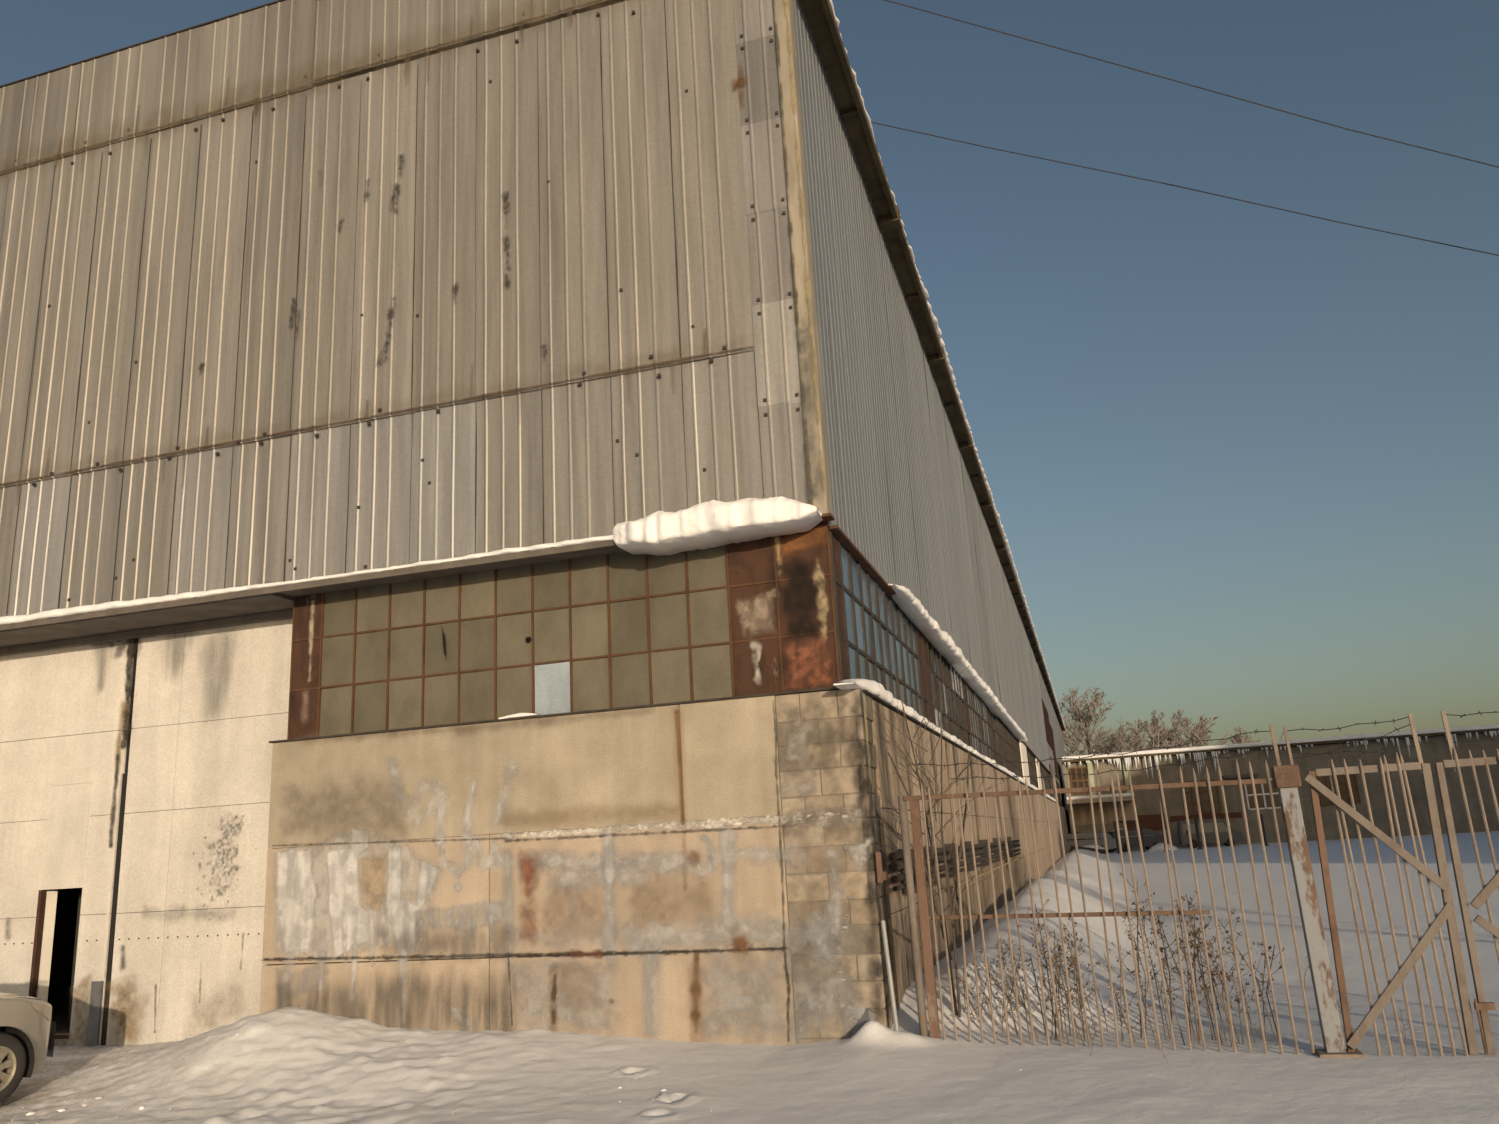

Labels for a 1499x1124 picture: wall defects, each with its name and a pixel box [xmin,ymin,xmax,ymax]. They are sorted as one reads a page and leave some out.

peeling [738,527,830,687]
leakage [308,984,425,1027]
leakage [447,990,508,1032]